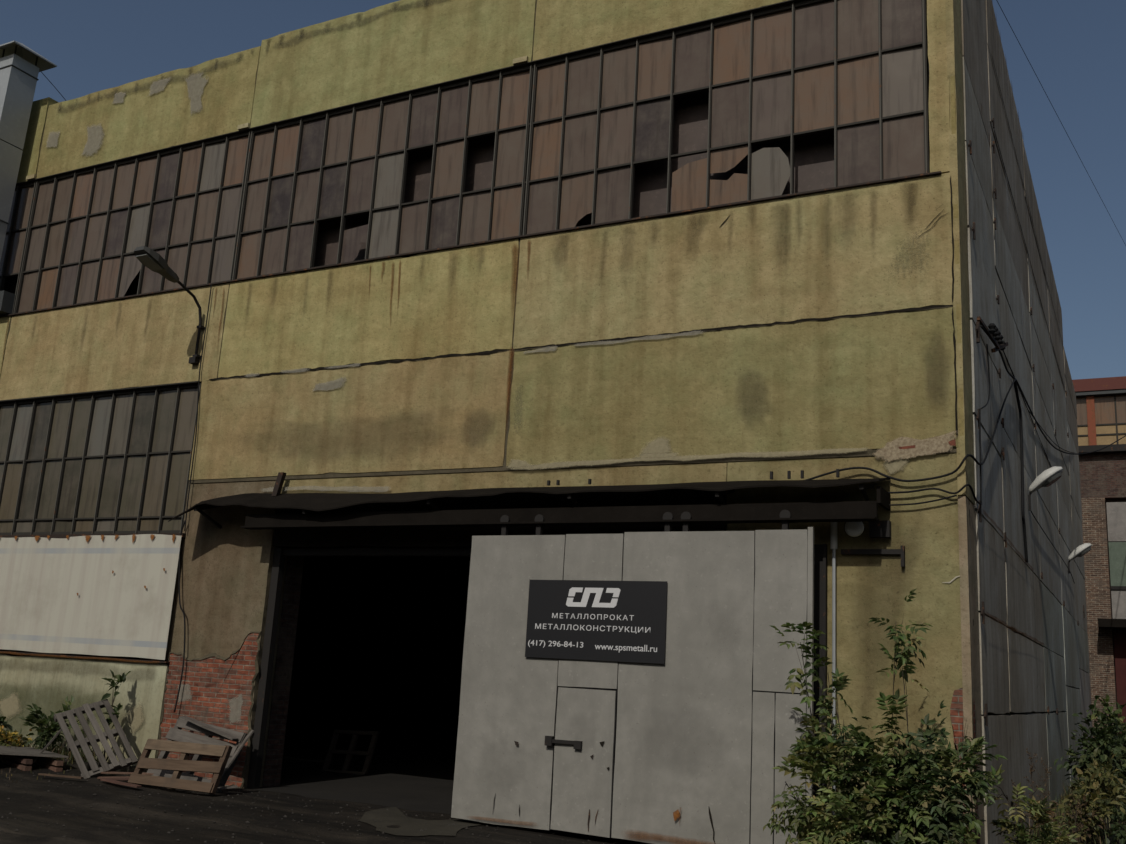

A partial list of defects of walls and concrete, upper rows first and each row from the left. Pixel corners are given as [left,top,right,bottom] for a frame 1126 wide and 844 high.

spalling [508,431,956,473]
peeling [0,693,20,719]
peeling [157,631,261,788]